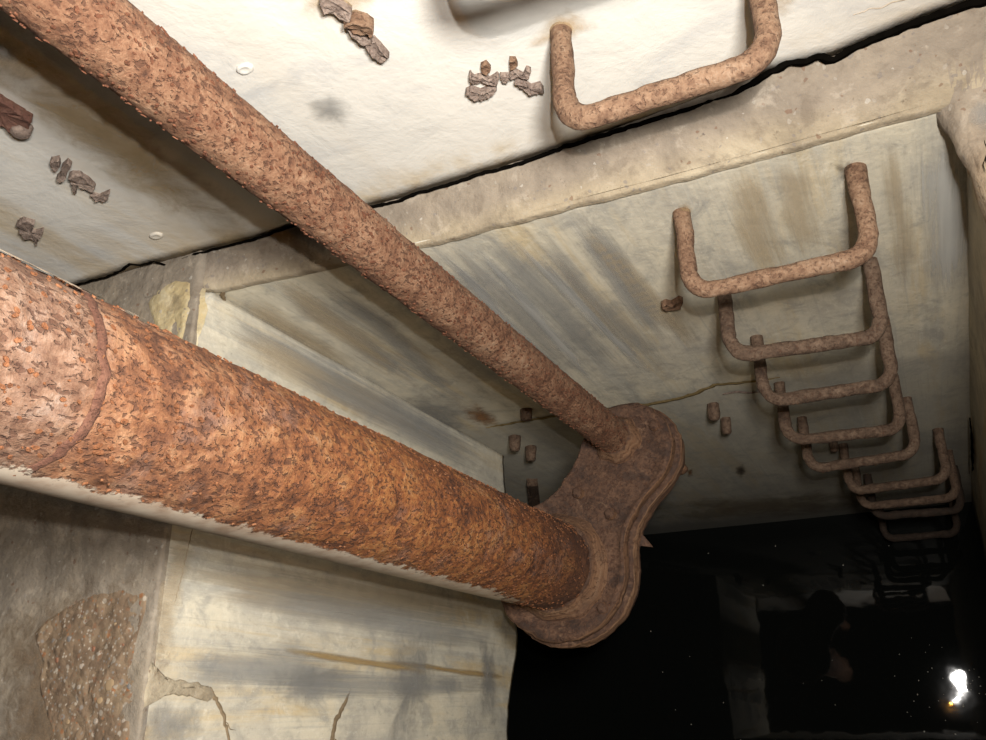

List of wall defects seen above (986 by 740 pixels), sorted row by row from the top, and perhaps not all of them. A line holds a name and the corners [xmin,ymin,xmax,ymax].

crack [369,0,986,208]
crack [74,225,297,286]
corrosion [69,1,627,453]
spalling [6,590,147,740]
spalling [144,654,216,707]
crack [210,687,233,740]
crack [330,689,351,740]